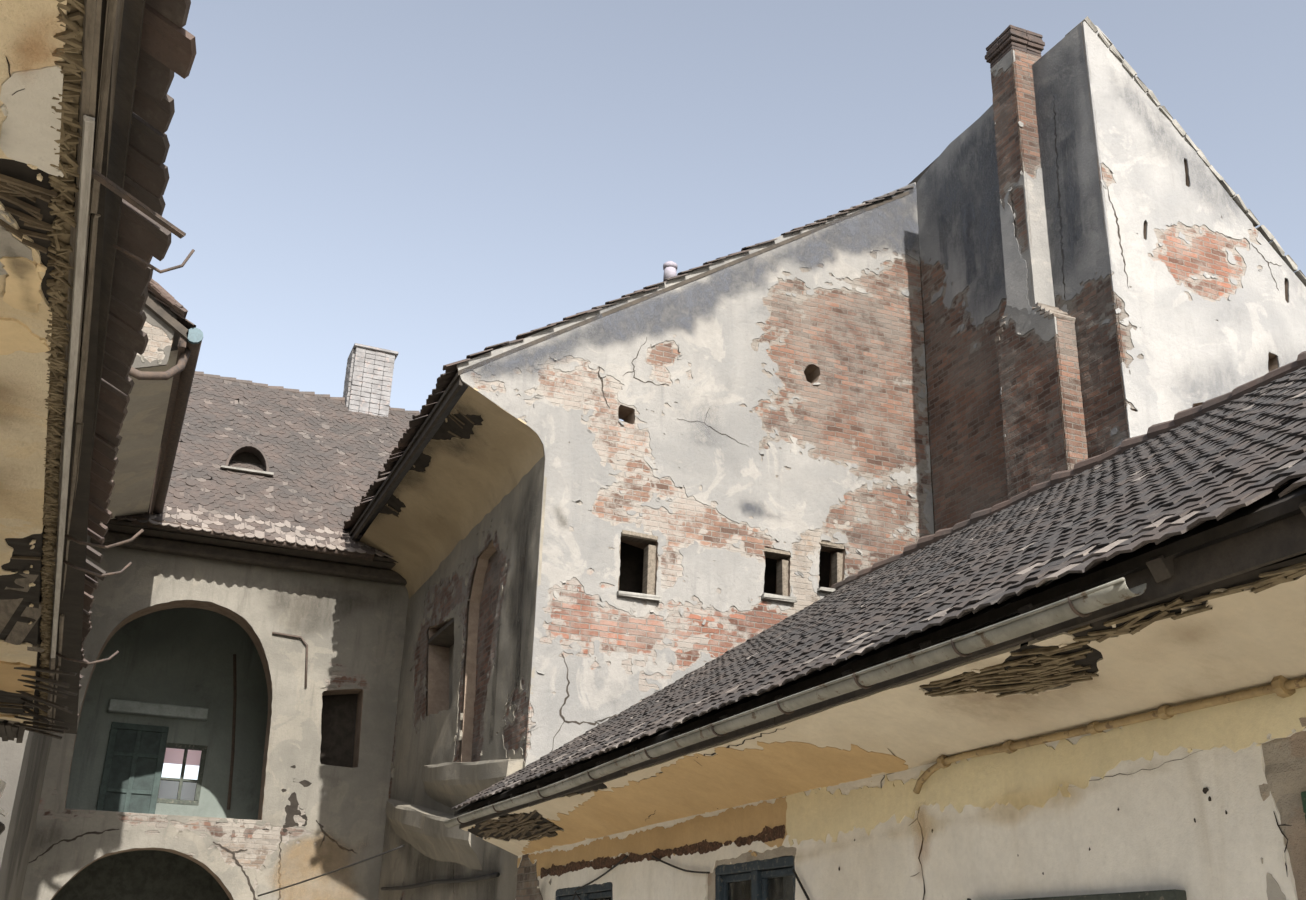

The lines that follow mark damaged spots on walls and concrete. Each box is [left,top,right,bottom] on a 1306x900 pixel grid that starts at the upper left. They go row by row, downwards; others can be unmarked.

flaking render [0,65,64,181]
flaking render [0,210,50,355]
flaking render [1148,215,1262,302]
crack [598,337,668,408]
flaking render [471,49,1143,702]
crack [679,408,745,445]
crack [551,654,616,752]
peeling [515,687,1306,900]
crack [28,829,119,863]
crack [213,835,282,900]
crack [910,807,925,900]